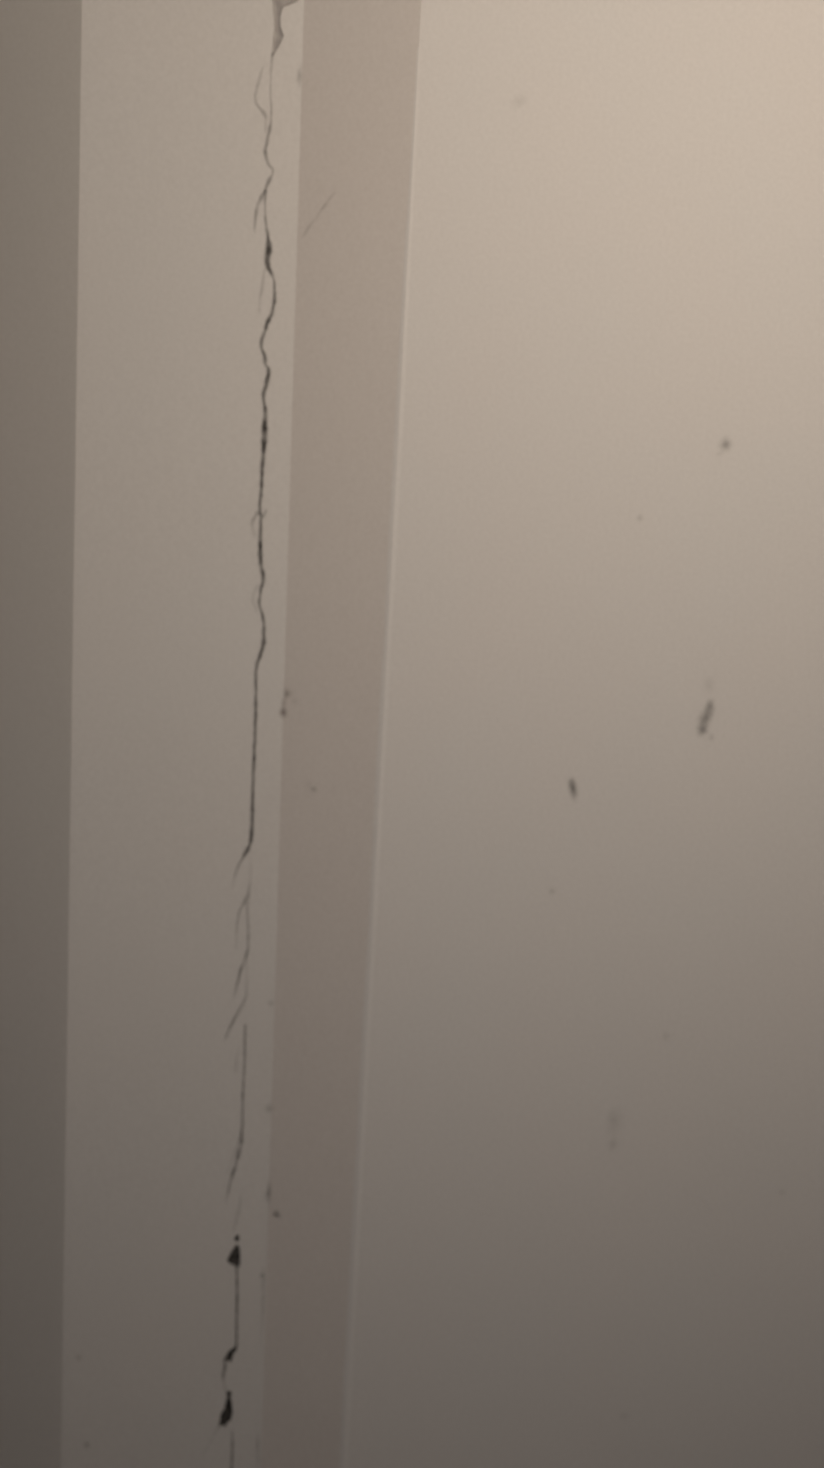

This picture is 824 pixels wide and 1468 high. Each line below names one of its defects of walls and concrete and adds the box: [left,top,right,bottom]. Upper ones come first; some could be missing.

crack [244,235,276,856]
crack [224,1268,238,1369]